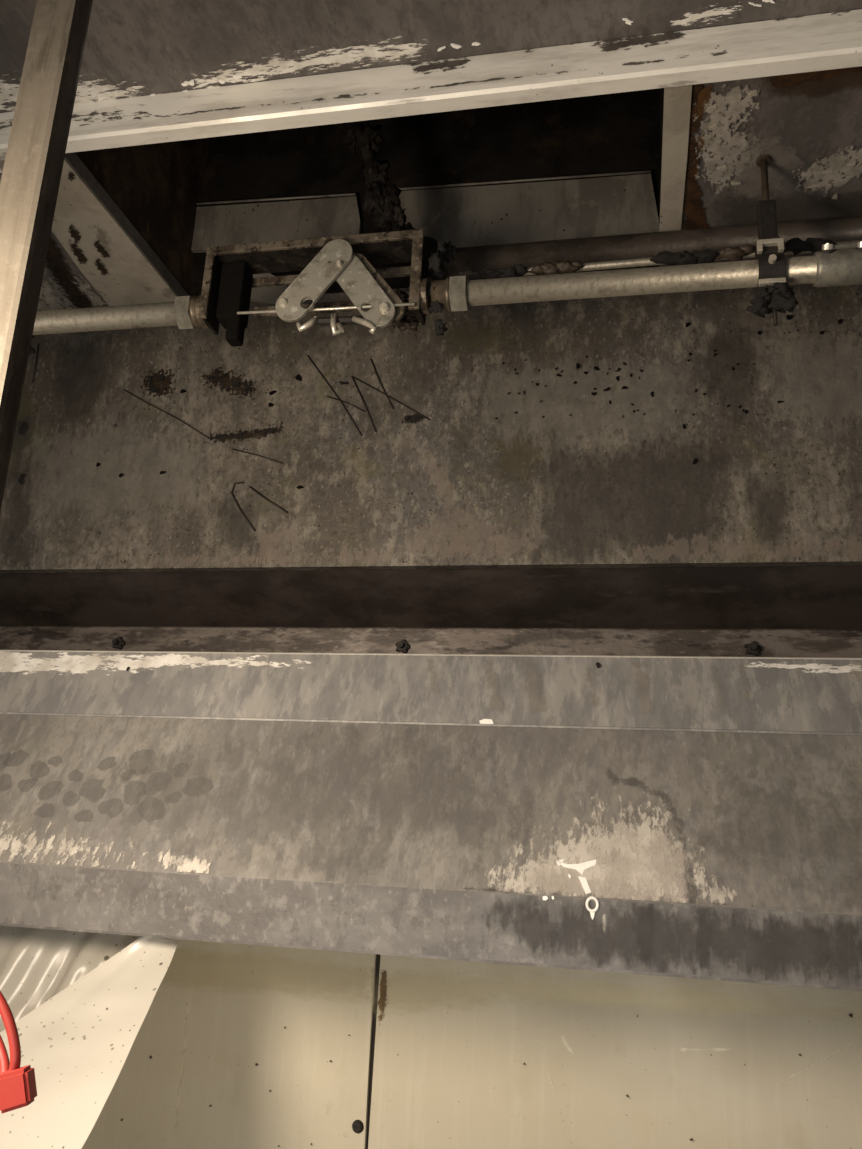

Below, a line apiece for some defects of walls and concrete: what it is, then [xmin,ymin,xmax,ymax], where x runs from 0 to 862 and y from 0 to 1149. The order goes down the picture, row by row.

rust [683,83,713,230]
peeling [694,80,760,194]
peeling [792,146,862,199]
peeling [488,796,737,906]
rust [376,970,388,1025]